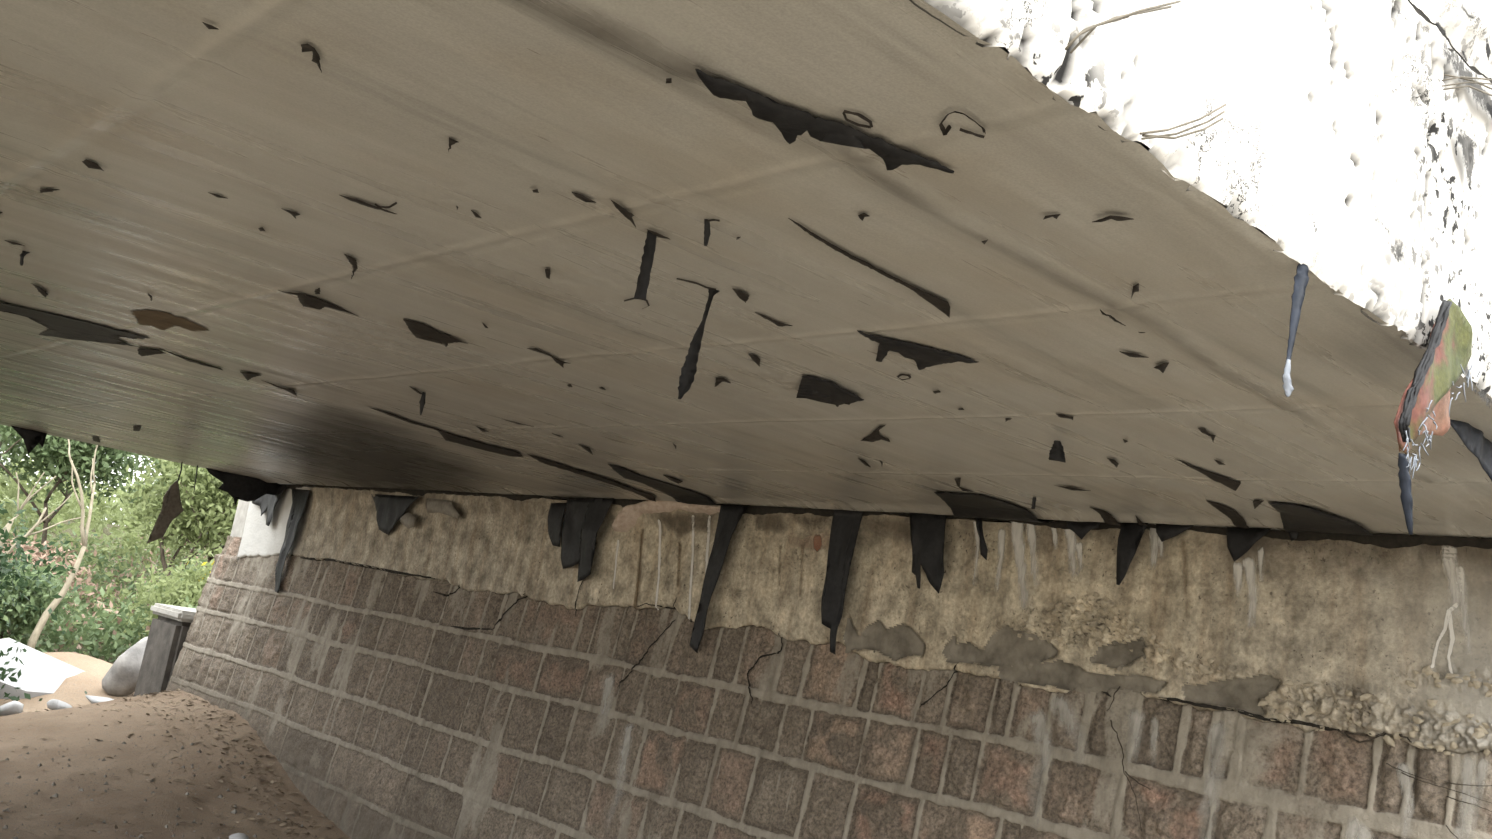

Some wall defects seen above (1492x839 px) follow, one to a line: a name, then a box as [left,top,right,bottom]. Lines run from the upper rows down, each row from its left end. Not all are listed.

crack [617,597,677,688]
spalling [843,618,925,661]
damp [997,522,1082,604]
damp [1150,523,1163,566]
damp [1233,547,1263,616]
damp [1430,545,1492,674]
spalling [942,625,1492,756]
crack [1159,697,1337,731]